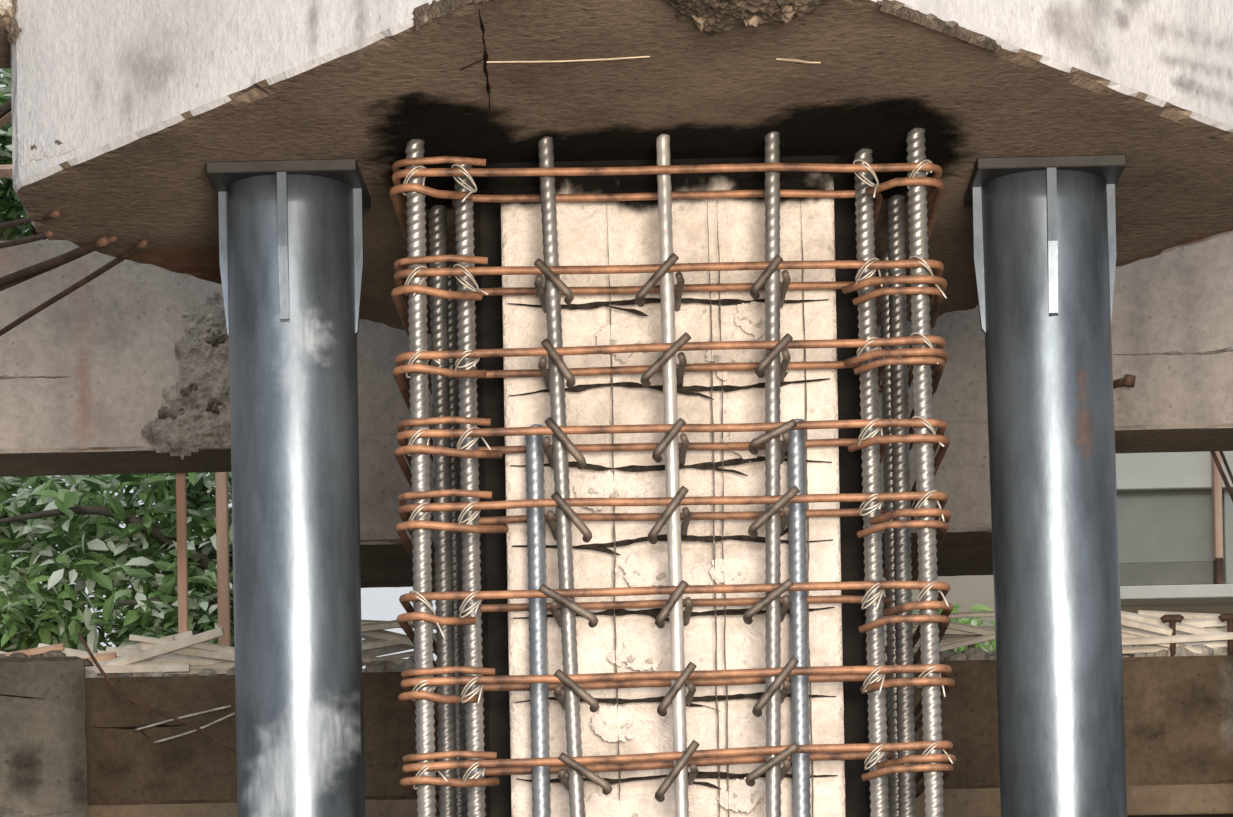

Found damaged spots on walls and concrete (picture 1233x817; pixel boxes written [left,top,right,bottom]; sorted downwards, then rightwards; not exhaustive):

spalling [705,302,765,380]
spalling [141,293,231,460]
crack [509,372,830,400]
crack [510,451,832,476]
spalling [574,470,627,511]
crack [512,528,833,555]
crack [513,604,835,625]
crack [515,692,836,711]
spalling [591,705,635,742]
crack [516,763,838,790]
spalling [584,793,646,817]
spalling [717,777,766,813]